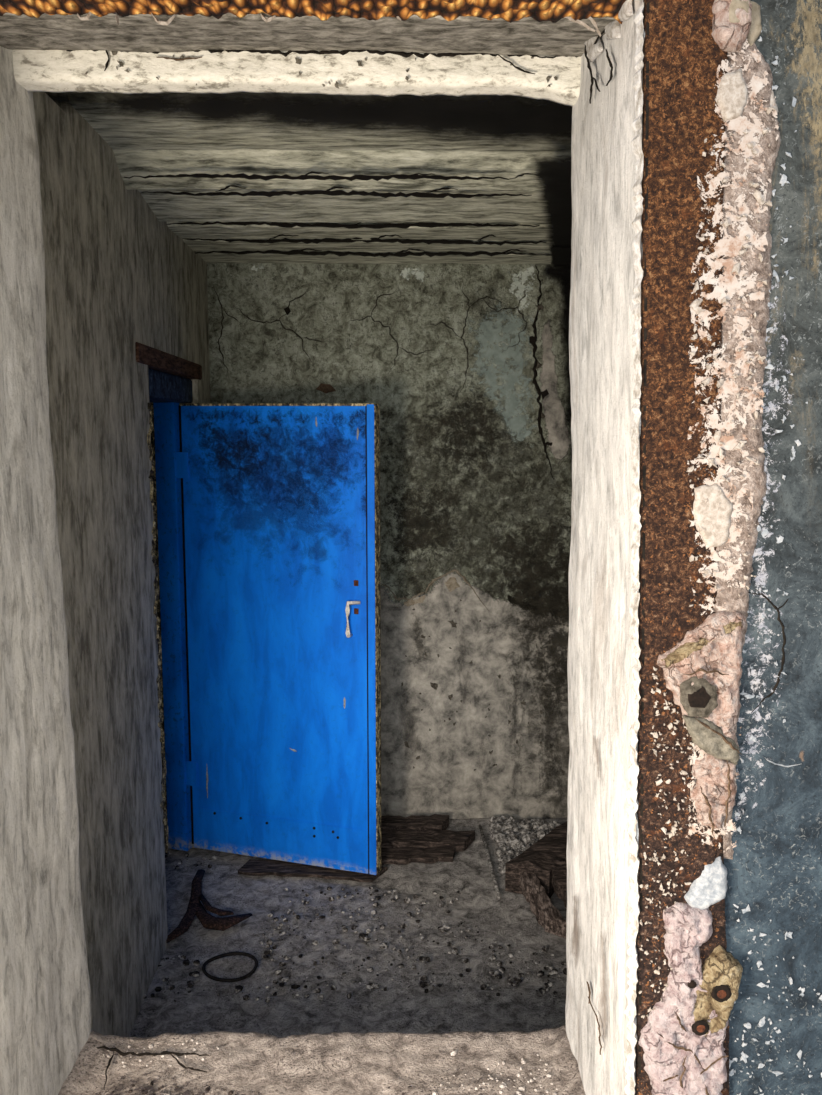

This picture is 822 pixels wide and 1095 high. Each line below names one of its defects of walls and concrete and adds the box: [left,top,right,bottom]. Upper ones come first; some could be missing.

spalling [316,383,336,393]
damp [381,266,572,819]
spalling [529,267,572,478]
peeling [686,0,822,859]